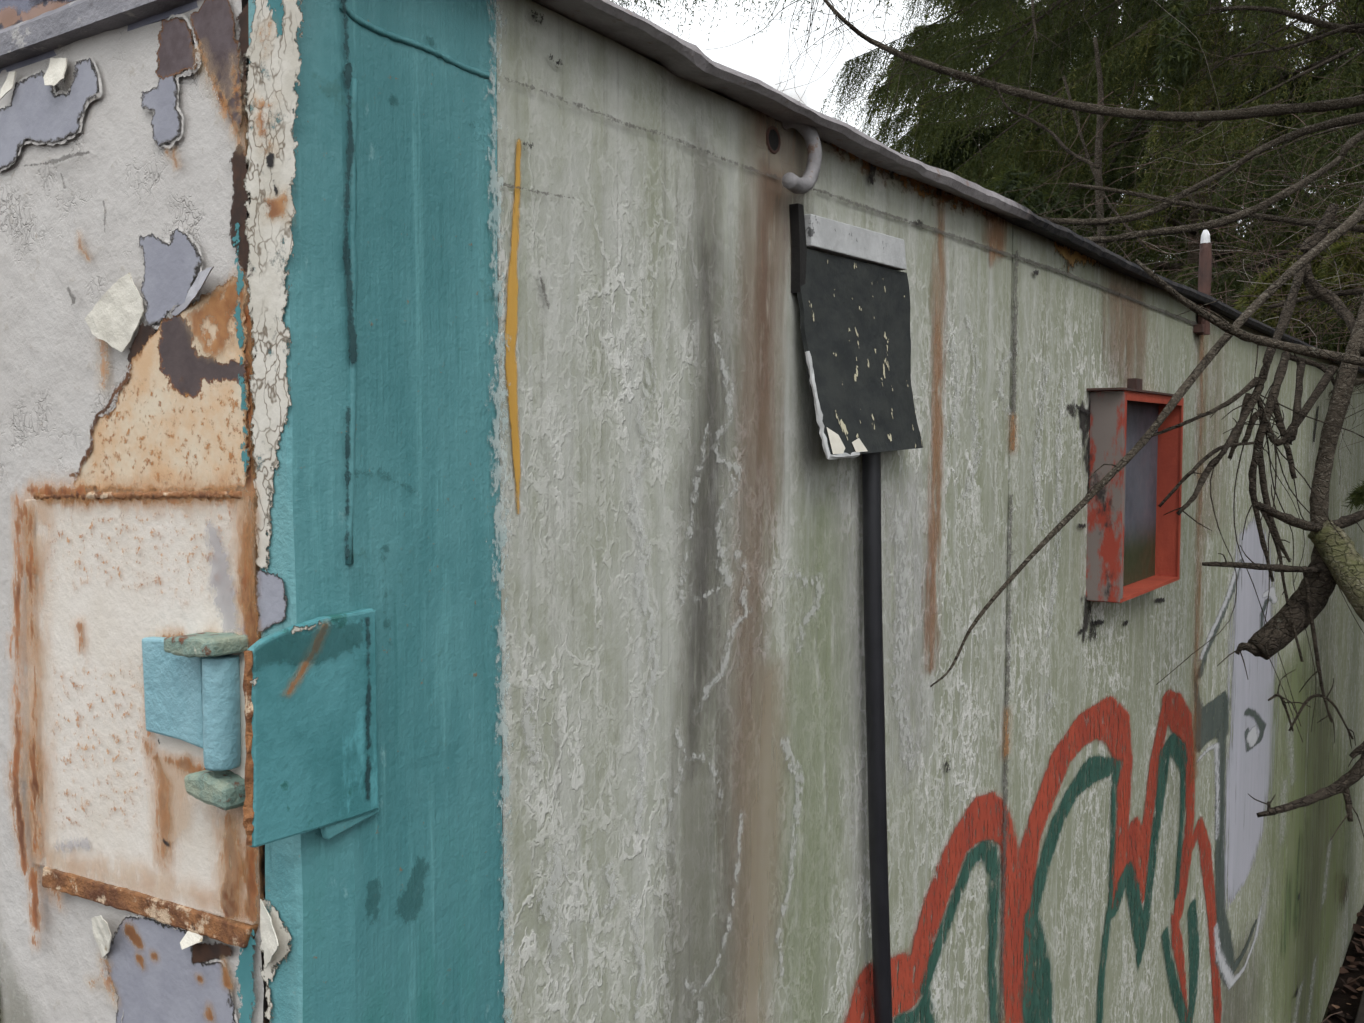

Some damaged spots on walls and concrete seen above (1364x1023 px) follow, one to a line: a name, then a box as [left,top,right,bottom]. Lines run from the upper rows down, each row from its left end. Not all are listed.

peeling [0,0,74,28]
peeling [0,57,102,172]
peeling [141,14,201,149]
corrosion [9,268,260,948]
peeling [85,226,214,387]
peeling [243,0,304,635]
water stain [628,340,658,835]
water stain [679,334,748,698]
corrosion [925,312,943,670]
peeling [89,913,238,1023]
peeling [258,896,292,1023]
water stain [686,671,804,1023]